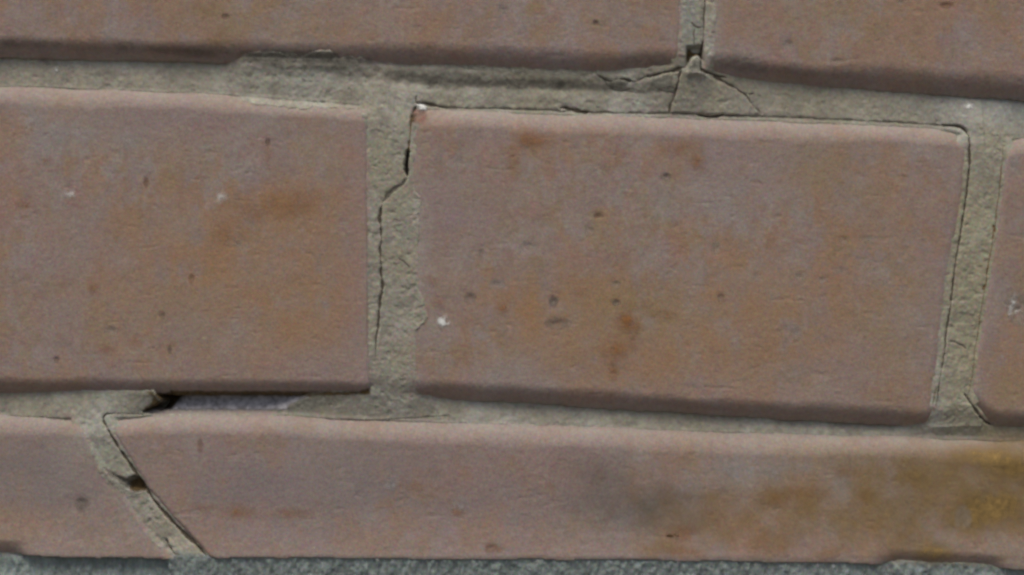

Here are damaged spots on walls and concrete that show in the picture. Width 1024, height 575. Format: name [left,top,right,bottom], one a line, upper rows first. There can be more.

crack [375,0,1003,425]
crack [103,413,206,555]